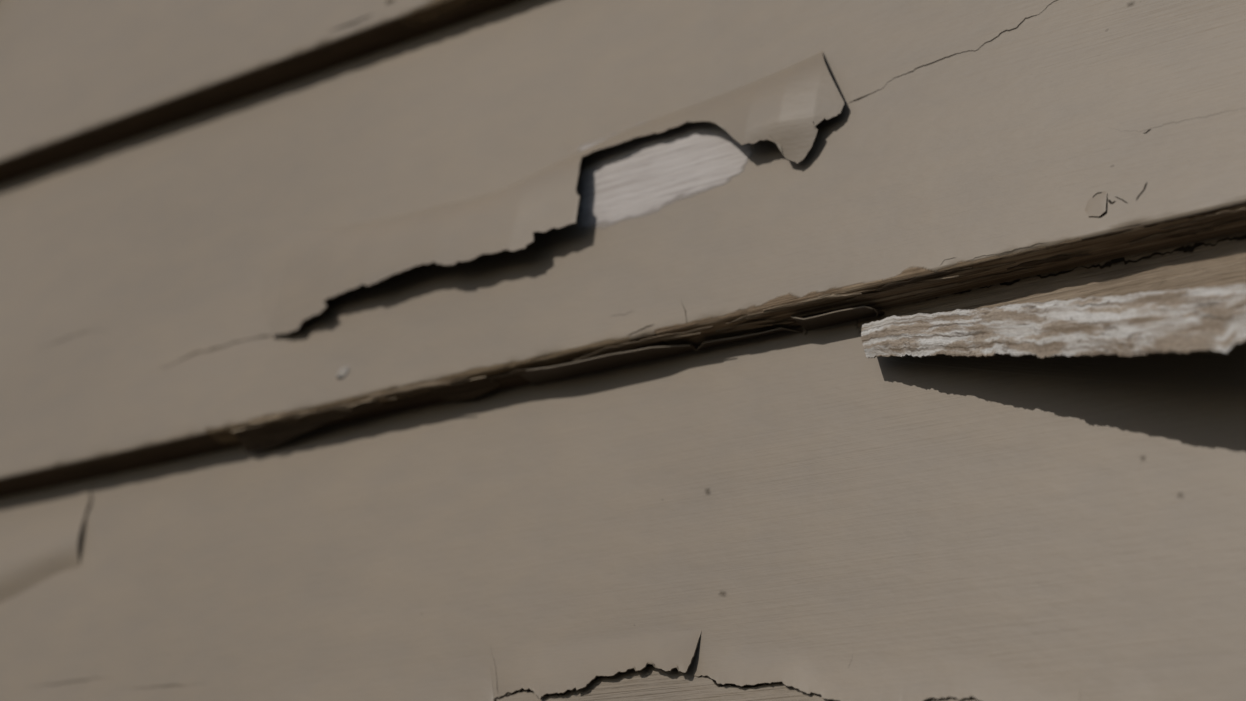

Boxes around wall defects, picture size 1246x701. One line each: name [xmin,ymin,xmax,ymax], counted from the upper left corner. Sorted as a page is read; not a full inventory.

crack [849,0,1056,103]
peeling [260,51,845,337]
peeling [519,231,1246,387]
peeling [494,629,1080,701]